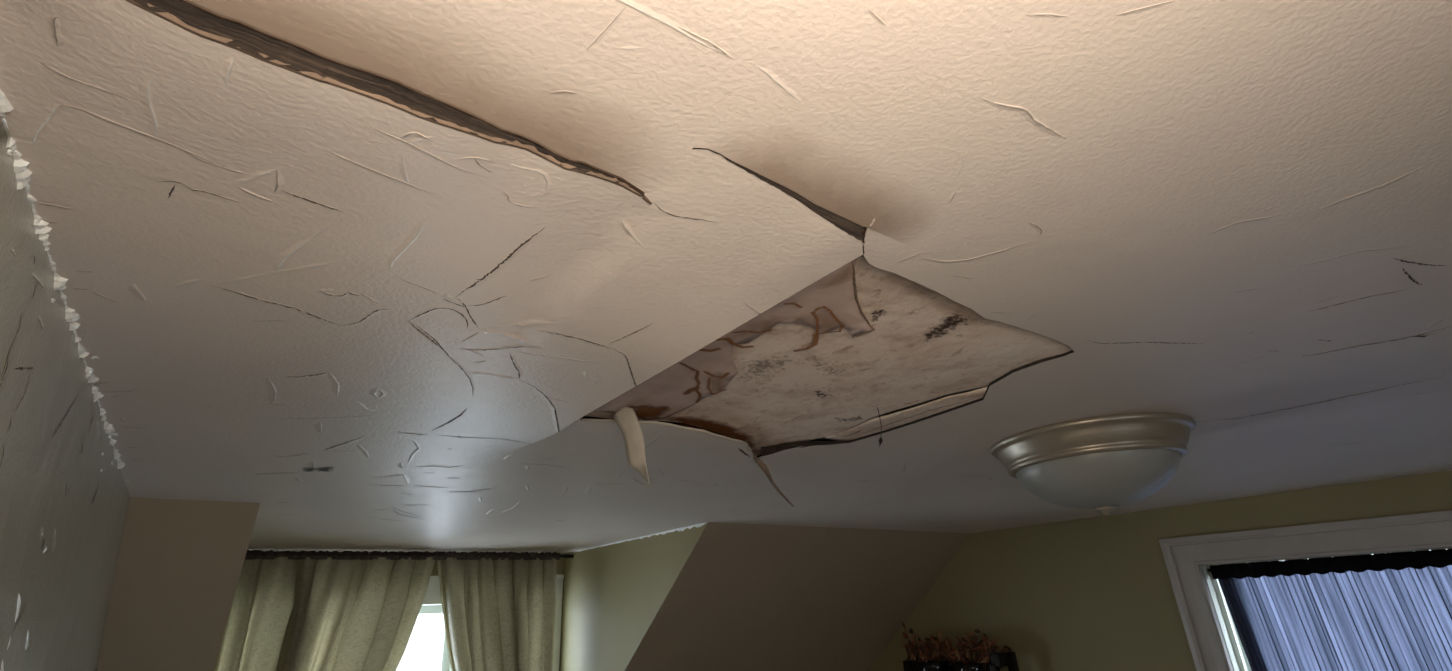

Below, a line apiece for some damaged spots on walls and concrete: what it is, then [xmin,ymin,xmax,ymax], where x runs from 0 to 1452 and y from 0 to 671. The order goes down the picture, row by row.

crack [126,0,719,223]
crack [693,148,875,257]
crack [456,227,546,297]
crack [1308,258,1447,312]
crack [211,285,529,451]
crack [538,323,653,386]
flaking render [638,227,1072,463]
crack [1086,338,1206,346]
crack [1301,326,1452,356]
flaking render [580,412,616,423]